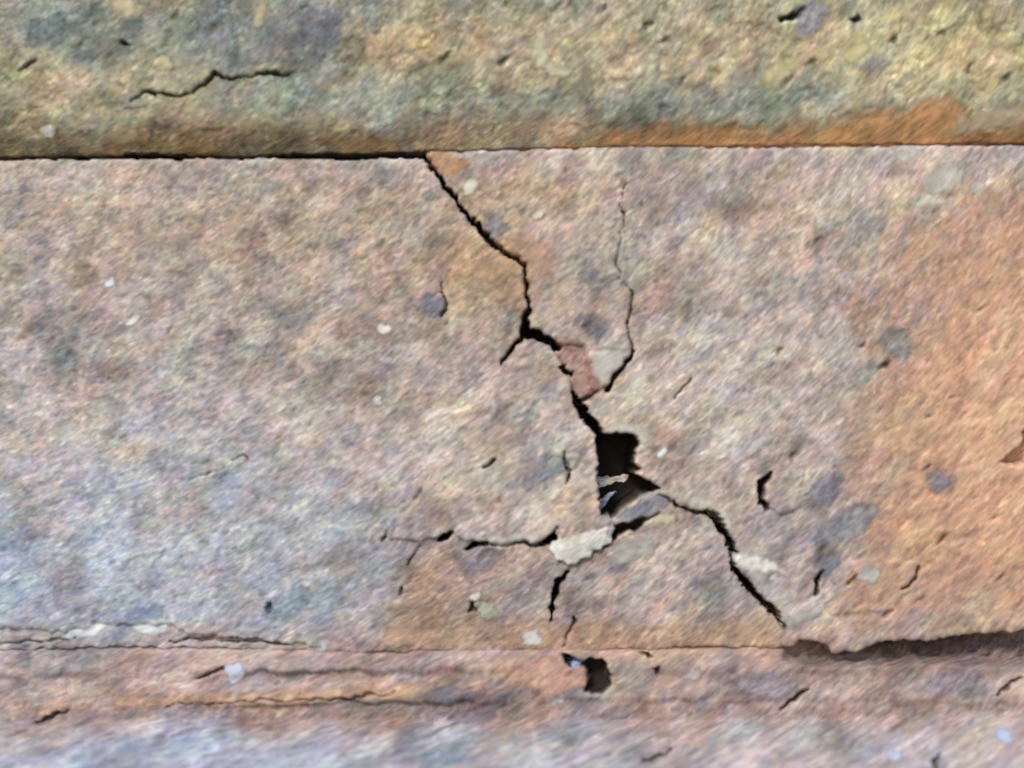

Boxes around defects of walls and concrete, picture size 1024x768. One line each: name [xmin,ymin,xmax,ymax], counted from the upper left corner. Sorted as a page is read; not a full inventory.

crack [133,71,290,101]
crack [425,156,633,439]
crack [757,471,771,510]
crack [438,527,558,550]
crack [603,494,785,629]
crack [549,571,576,638]
peeling [563,652,659,693]